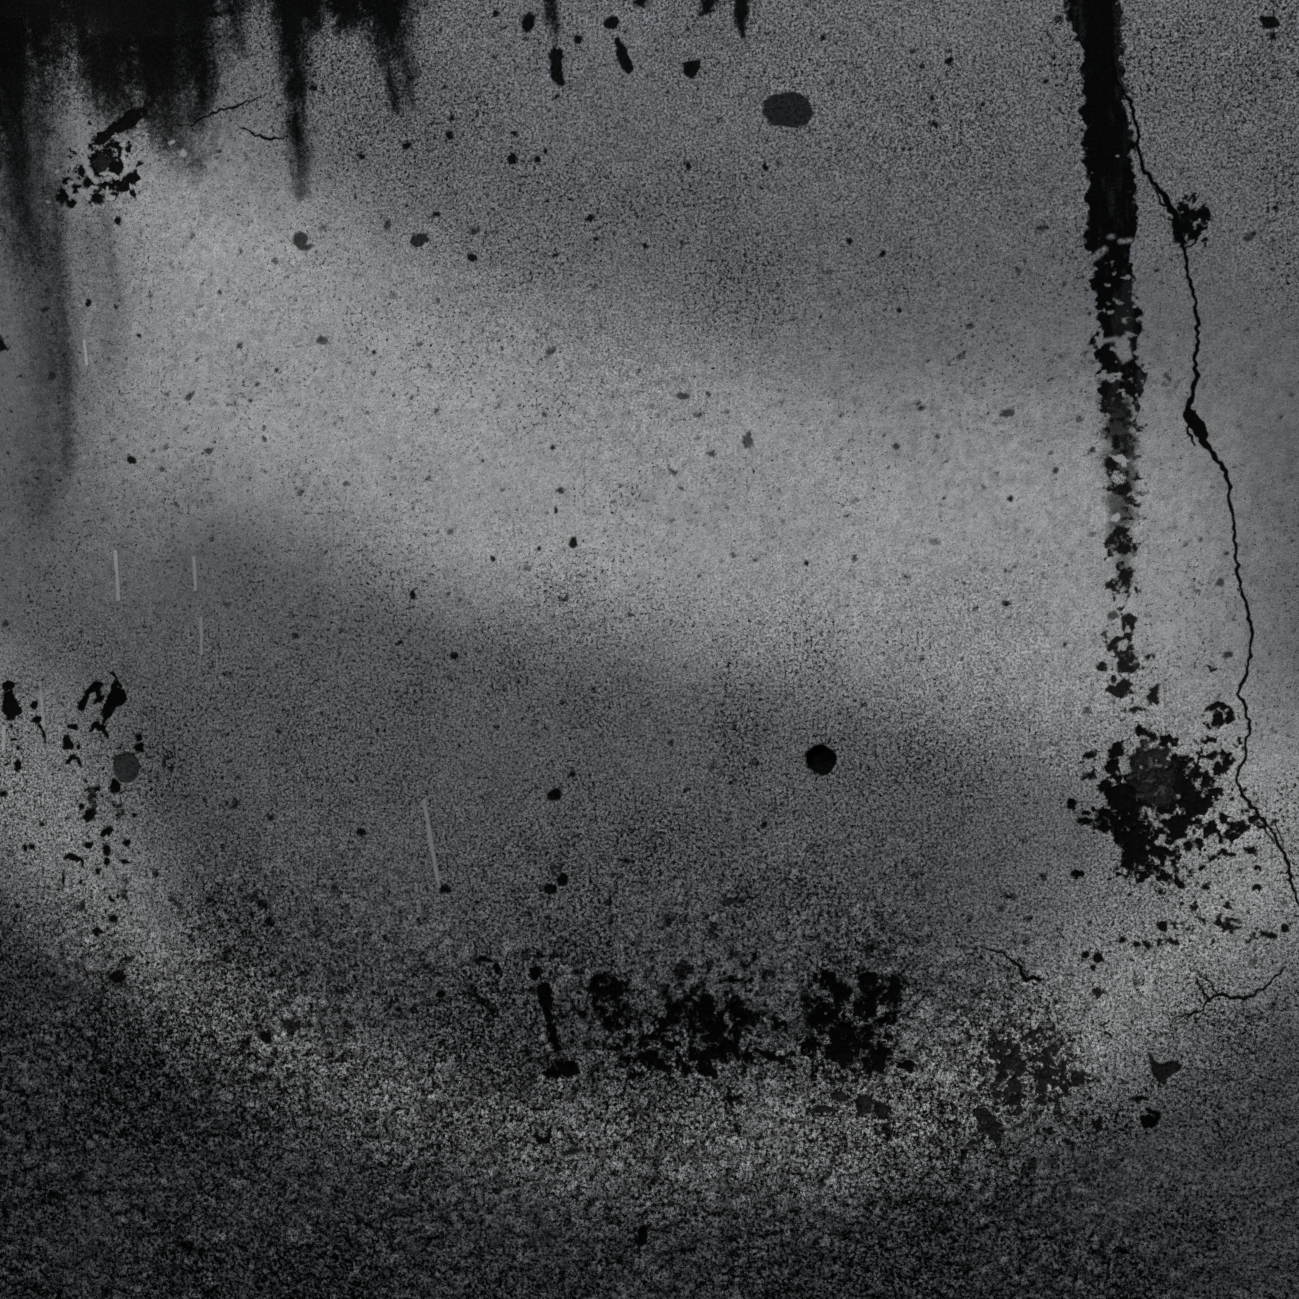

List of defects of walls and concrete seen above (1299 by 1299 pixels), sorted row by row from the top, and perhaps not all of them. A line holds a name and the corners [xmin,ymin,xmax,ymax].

water stain [543,0,559,41]
water stain [698,0,716,16]
water stain [733,0,749,38]
spalling [46,106,147,225]
water stain [0,0,427,253]
water stain [1064,0,1159,713]
crack [1111,60,1299,905]
spalling [1,672,144,772]
spalling [61,778,136,886]
spalling [1066,701,1289,949]
spalling [529,952,918,1136]
crack [1173,966,1286,1019]